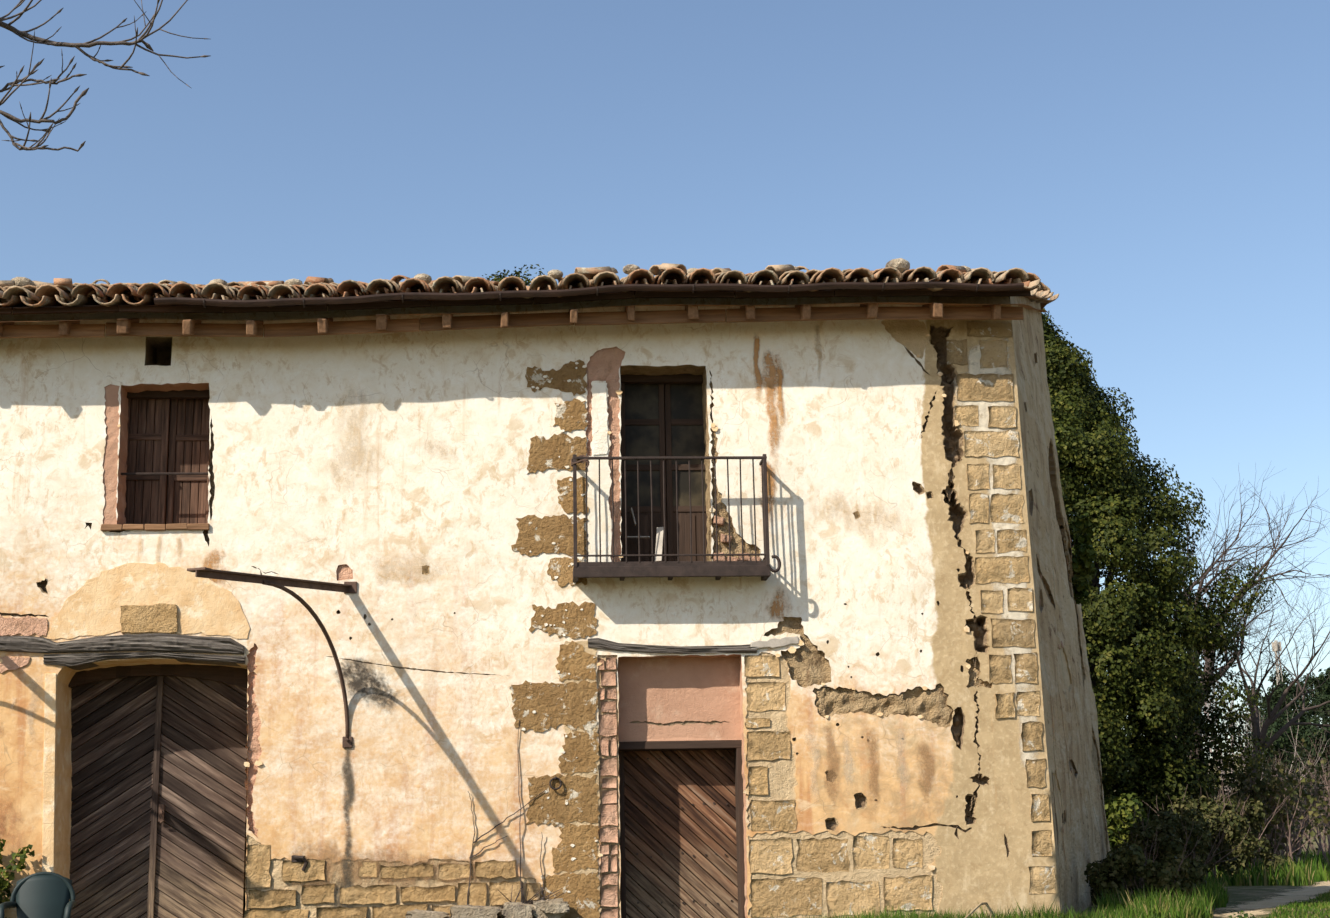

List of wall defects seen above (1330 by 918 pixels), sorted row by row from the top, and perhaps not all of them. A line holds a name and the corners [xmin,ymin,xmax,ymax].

flaking render [709,370,761,561]
spalling [36,577,48,594]
crack [883,324,981,839]
peeling [0,656,30,673]
peeling [0,615,48,637]
water stain [336,659,395,707]
flaking render [244,346,625,918]
spalling [960,615,992,688]
flaking render [743,617,966,918]
spalling [956,773,990,825]
crack [1003,834,1011,857]